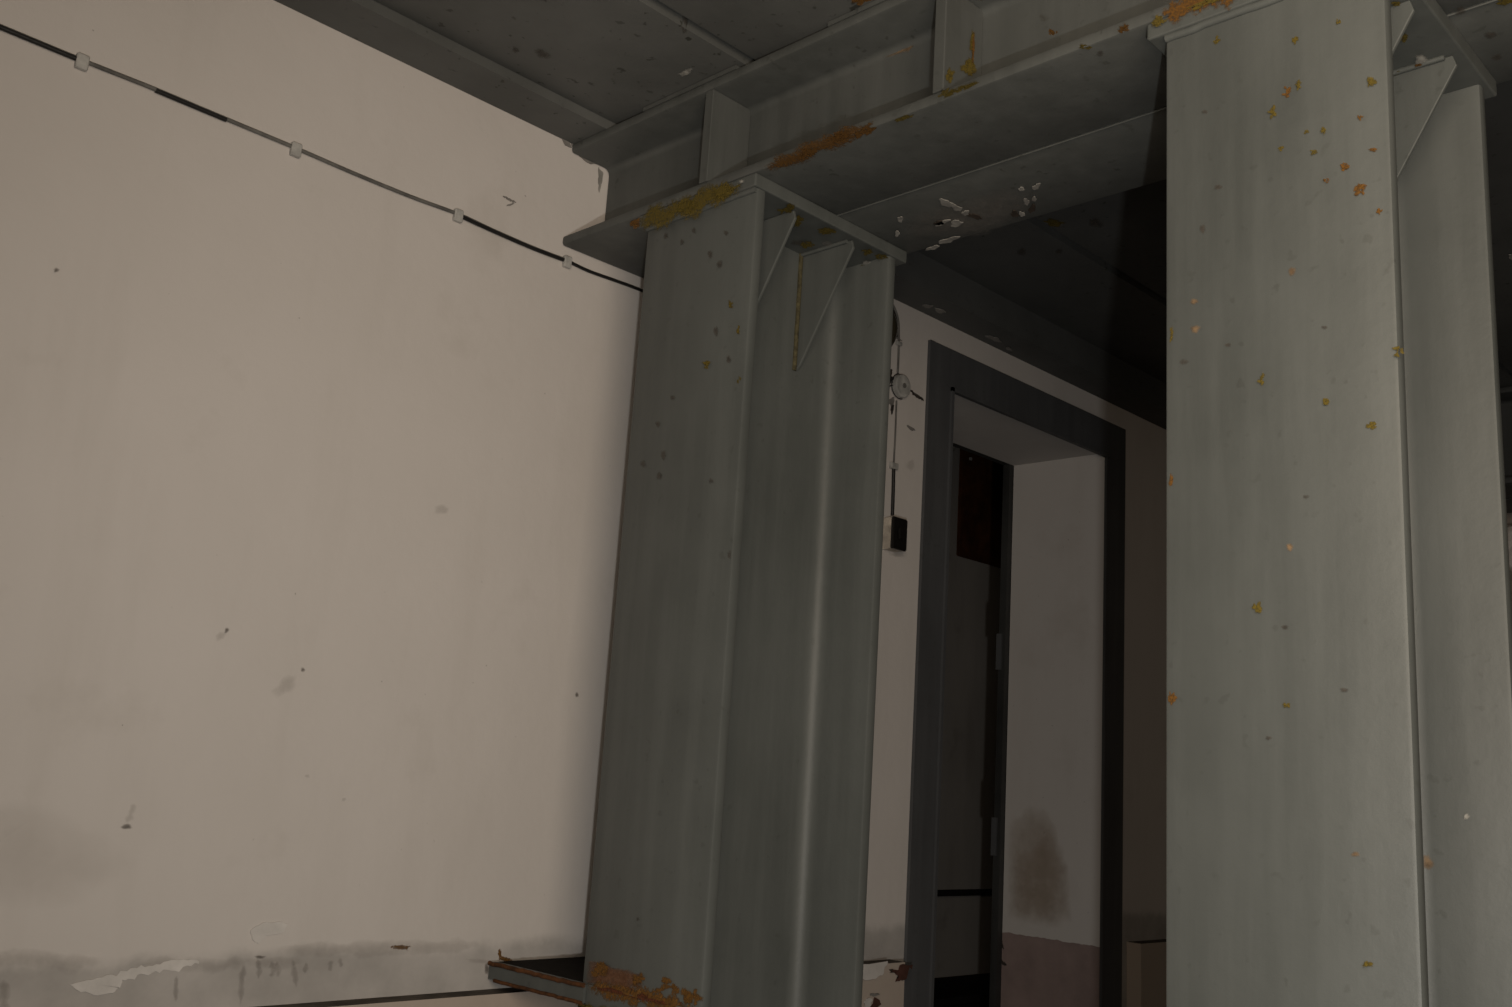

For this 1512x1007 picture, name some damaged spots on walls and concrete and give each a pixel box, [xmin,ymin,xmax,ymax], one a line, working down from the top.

corrosion [1152,0,1233,27]
corrosion [764,121,877,171]
corrosion [630,180,743,237]
corrosion [486,949,703,1007]